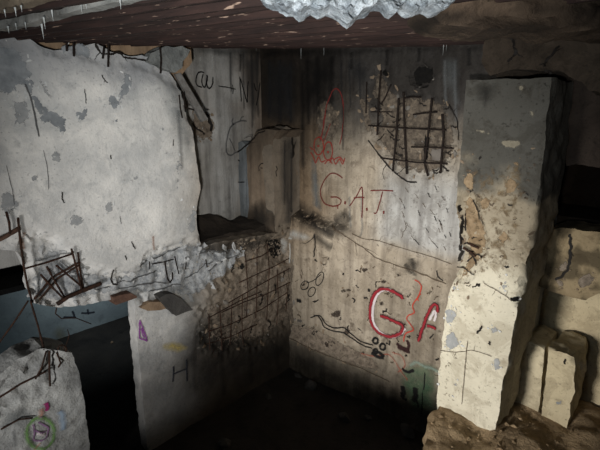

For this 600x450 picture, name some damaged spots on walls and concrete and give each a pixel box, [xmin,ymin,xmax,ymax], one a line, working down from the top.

spalling [0,193,378,398]
spalling [356,64,529,367]
crack [555,234,574,280]